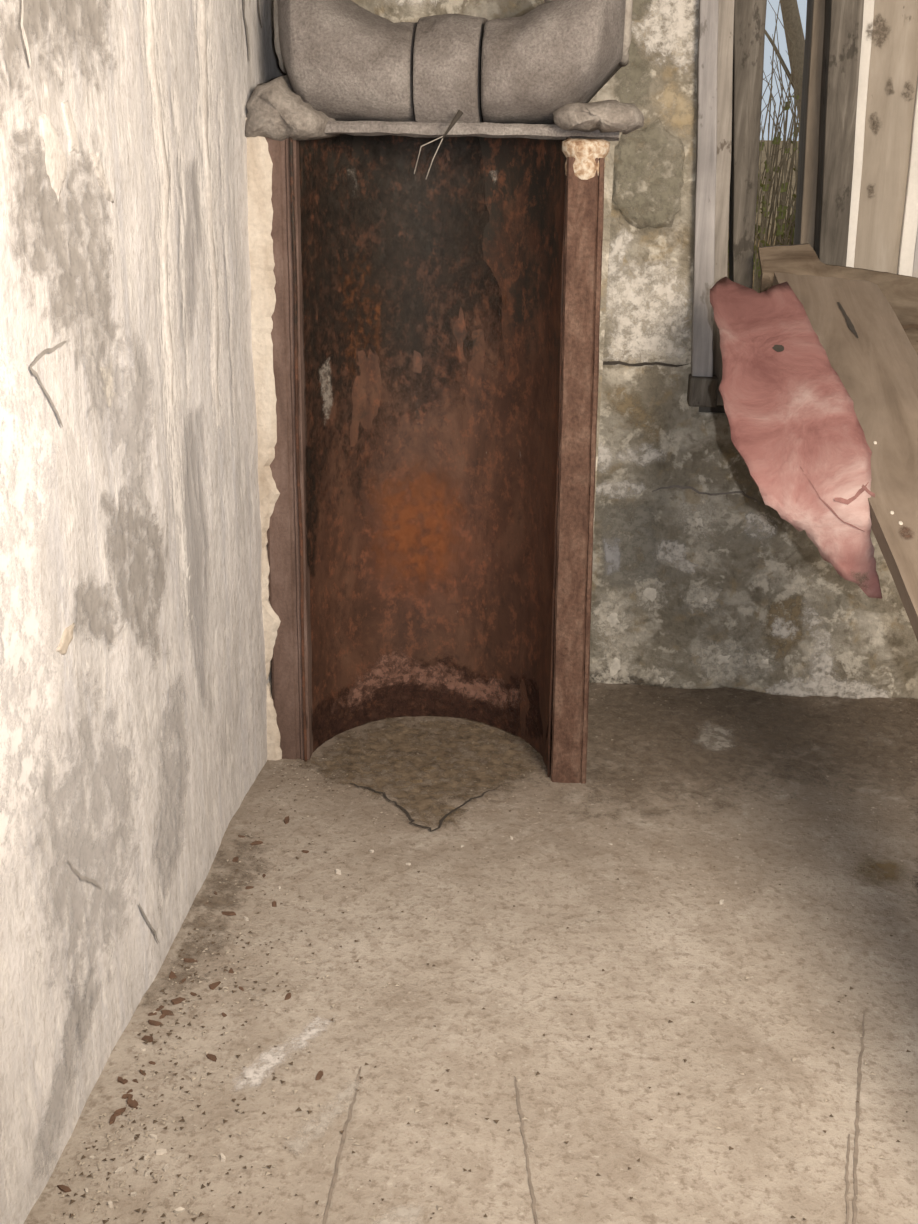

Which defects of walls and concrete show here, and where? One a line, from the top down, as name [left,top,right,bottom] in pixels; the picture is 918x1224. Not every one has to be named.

crack [322,1066,361,1224]
crack [515,1077,538,1224]
crack [845,1009,866,1224]